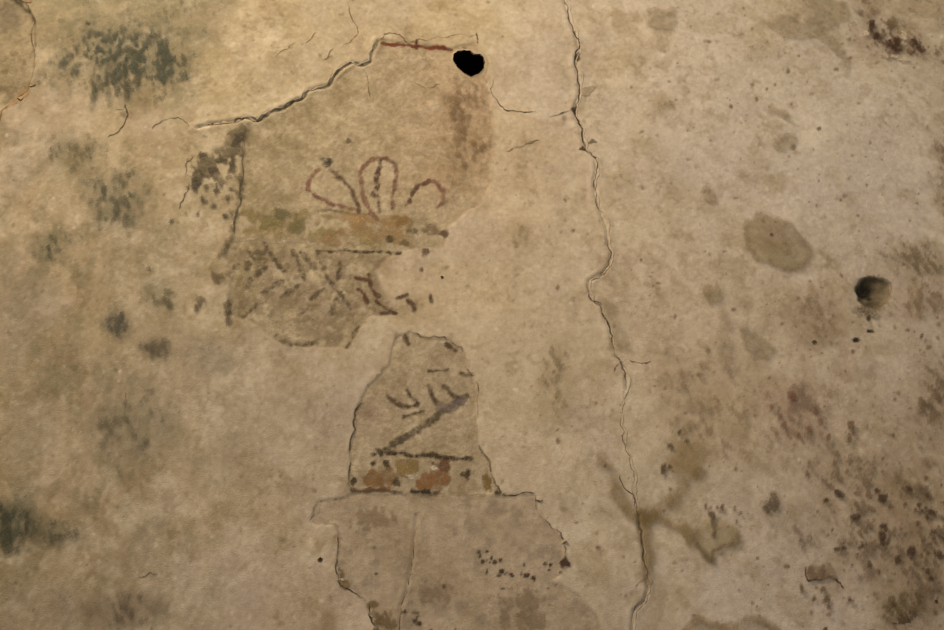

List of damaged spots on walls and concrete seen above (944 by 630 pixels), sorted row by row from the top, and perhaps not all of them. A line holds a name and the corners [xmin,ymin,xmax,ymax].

water stain [56,0,206,98]
crack [152,10,478,128]
water stain [858,8,944,62]
crack [560,0,652,630]
flaking render [853,277,890,342]
water stain [770,383,824,439]
peeling [313,492,600,630]
water stain [682,503,742,562]
water stain [823,451,944,629]